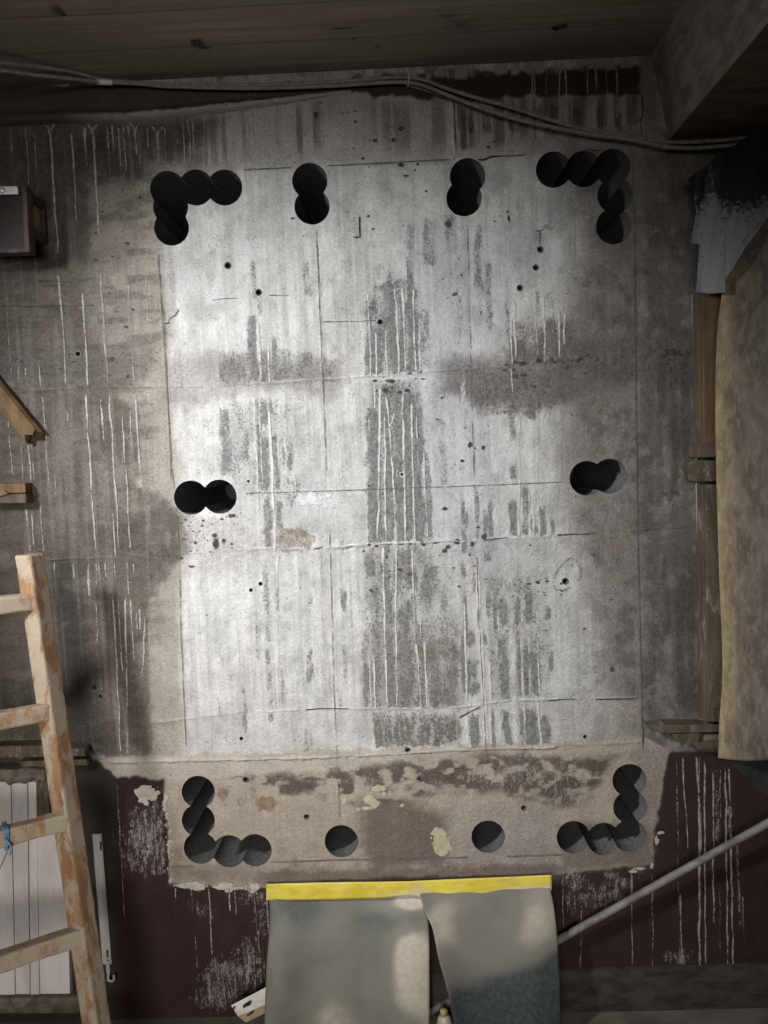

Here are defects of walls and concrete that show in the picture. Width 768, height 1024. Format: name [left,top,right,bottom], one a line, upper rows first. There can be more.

leakage [82,294,96,548]
leakage [4,116,206,383]
leakage [73,396,150,753]
leakage [219,262,335,387]
leakage [362,260,553,748]
leakage [474,225,493,330]
leakage [461,285,581,537]
peeling [134,785,260,893]
peeling [341,785,386,811]
flaking render [430,827,453,857]
leakage [677,758,743,964]